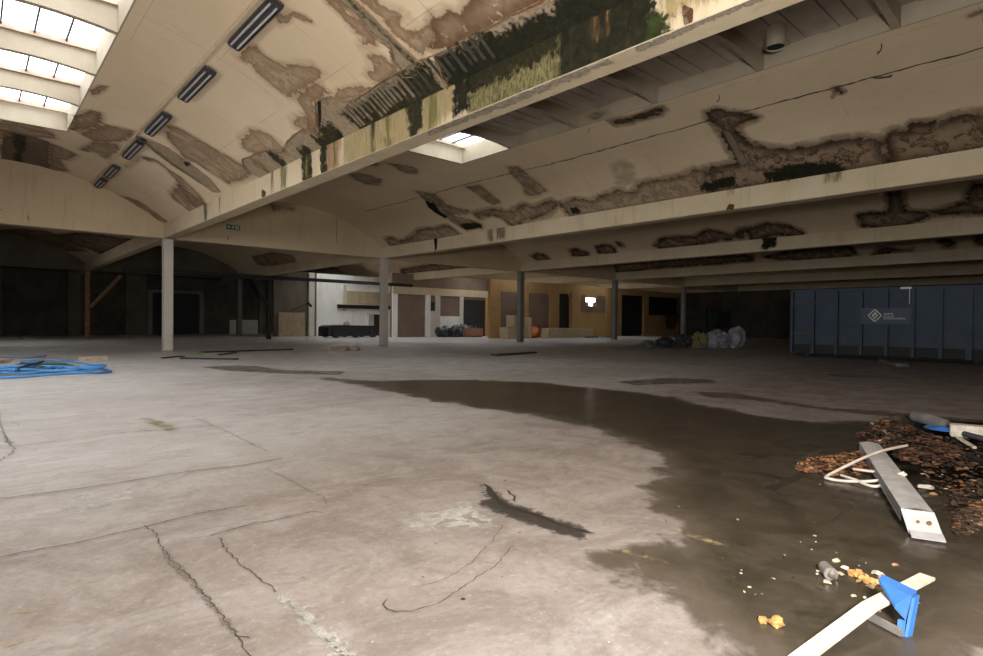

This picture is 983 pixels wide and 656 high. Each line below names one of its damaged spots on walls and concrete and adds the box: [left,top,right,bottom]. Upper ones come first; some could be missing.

leakage [239,0,399,135]
leakage [349,116,418,185]
leakage [405,94,437,137]
spalling [241,0,628,197]
leakage [361,0,538,56]
leakage [452,76,472,118]
leakage [622,378,909,417]
crack [144,525,251,656]
crack [220,538,355,656]
crack [383,484,593,612]